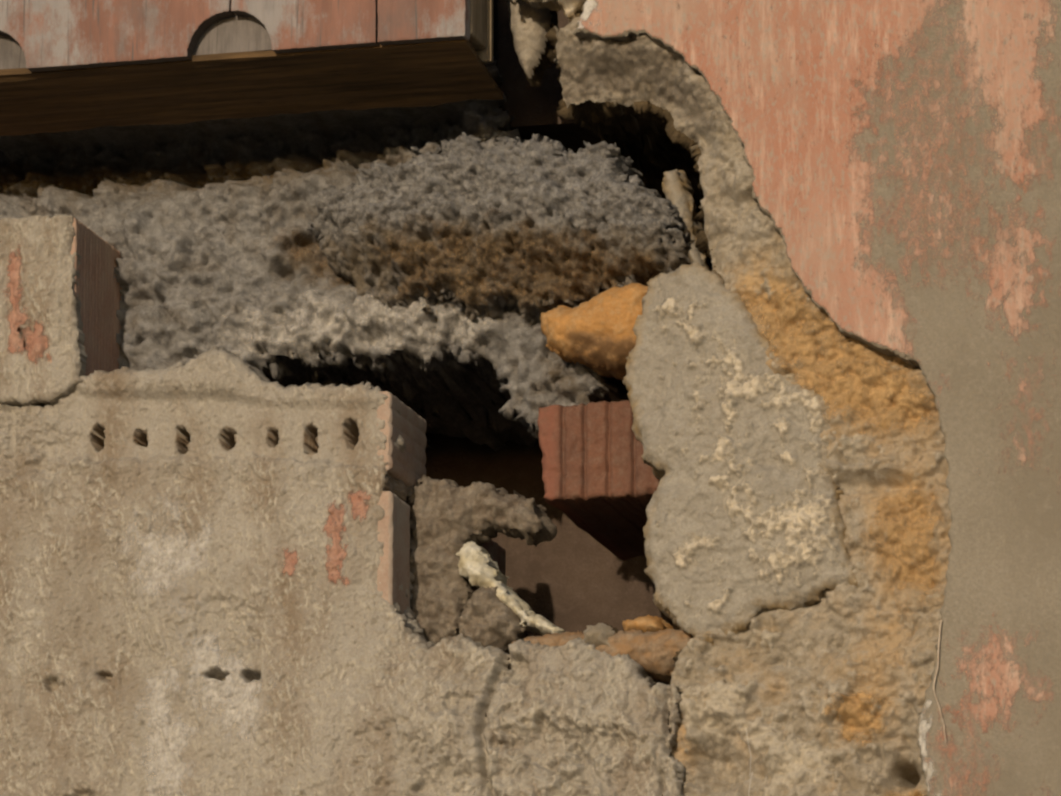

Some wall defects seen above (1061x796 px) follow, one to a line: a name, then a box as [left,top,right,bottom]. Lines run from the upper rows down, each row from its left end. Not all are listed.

spalling [545,0,1061,796]